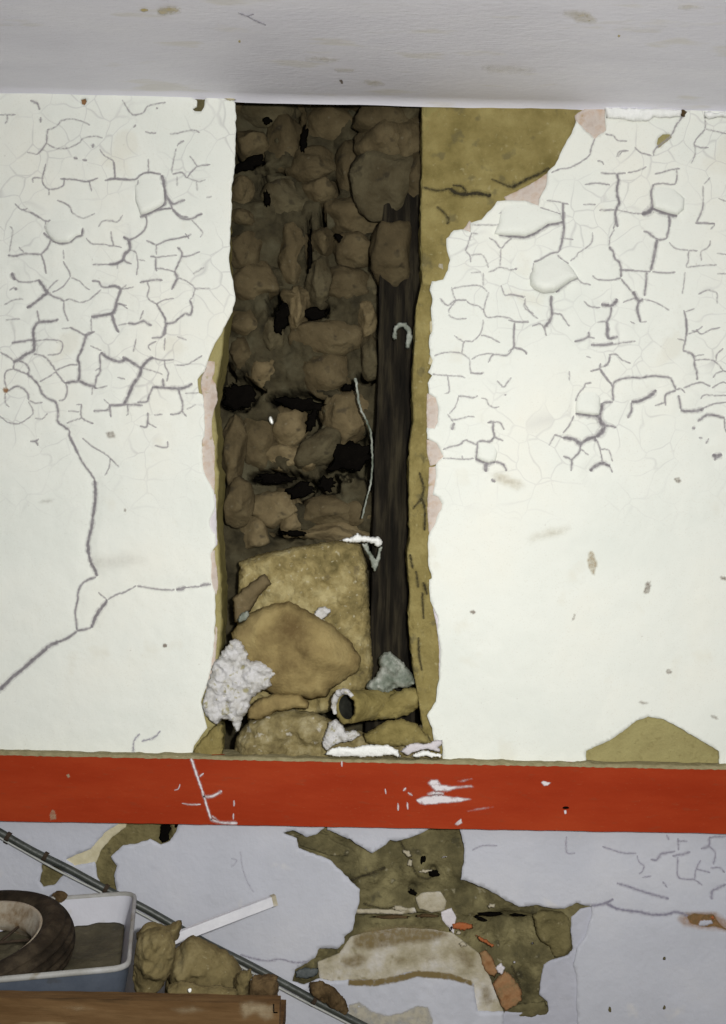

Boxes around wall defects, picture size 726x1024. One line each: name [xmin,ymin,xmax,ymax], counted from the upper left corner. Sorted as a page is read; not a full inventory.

crack [0,100,211,690]
flaking render [325,107,606,758]
crack [424,116,726,482]
flaking render [193,327,225,751]
flaking render [314,606,331,620]
spalling [586,717,719,763]
flaking render [40,823,178,890]
flaking render [285,827,592,1024]
crack [591,836,726,916]